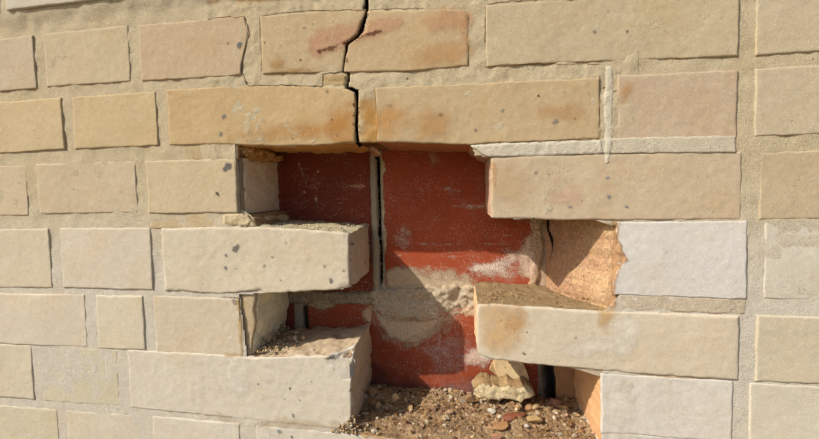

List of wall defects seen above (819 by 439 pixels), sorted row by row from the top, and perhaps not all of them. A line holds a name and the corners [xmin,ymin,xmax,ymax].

crack [484,0,527,42]
crack [208,0,423,284]
spalling [545,220,617,308]